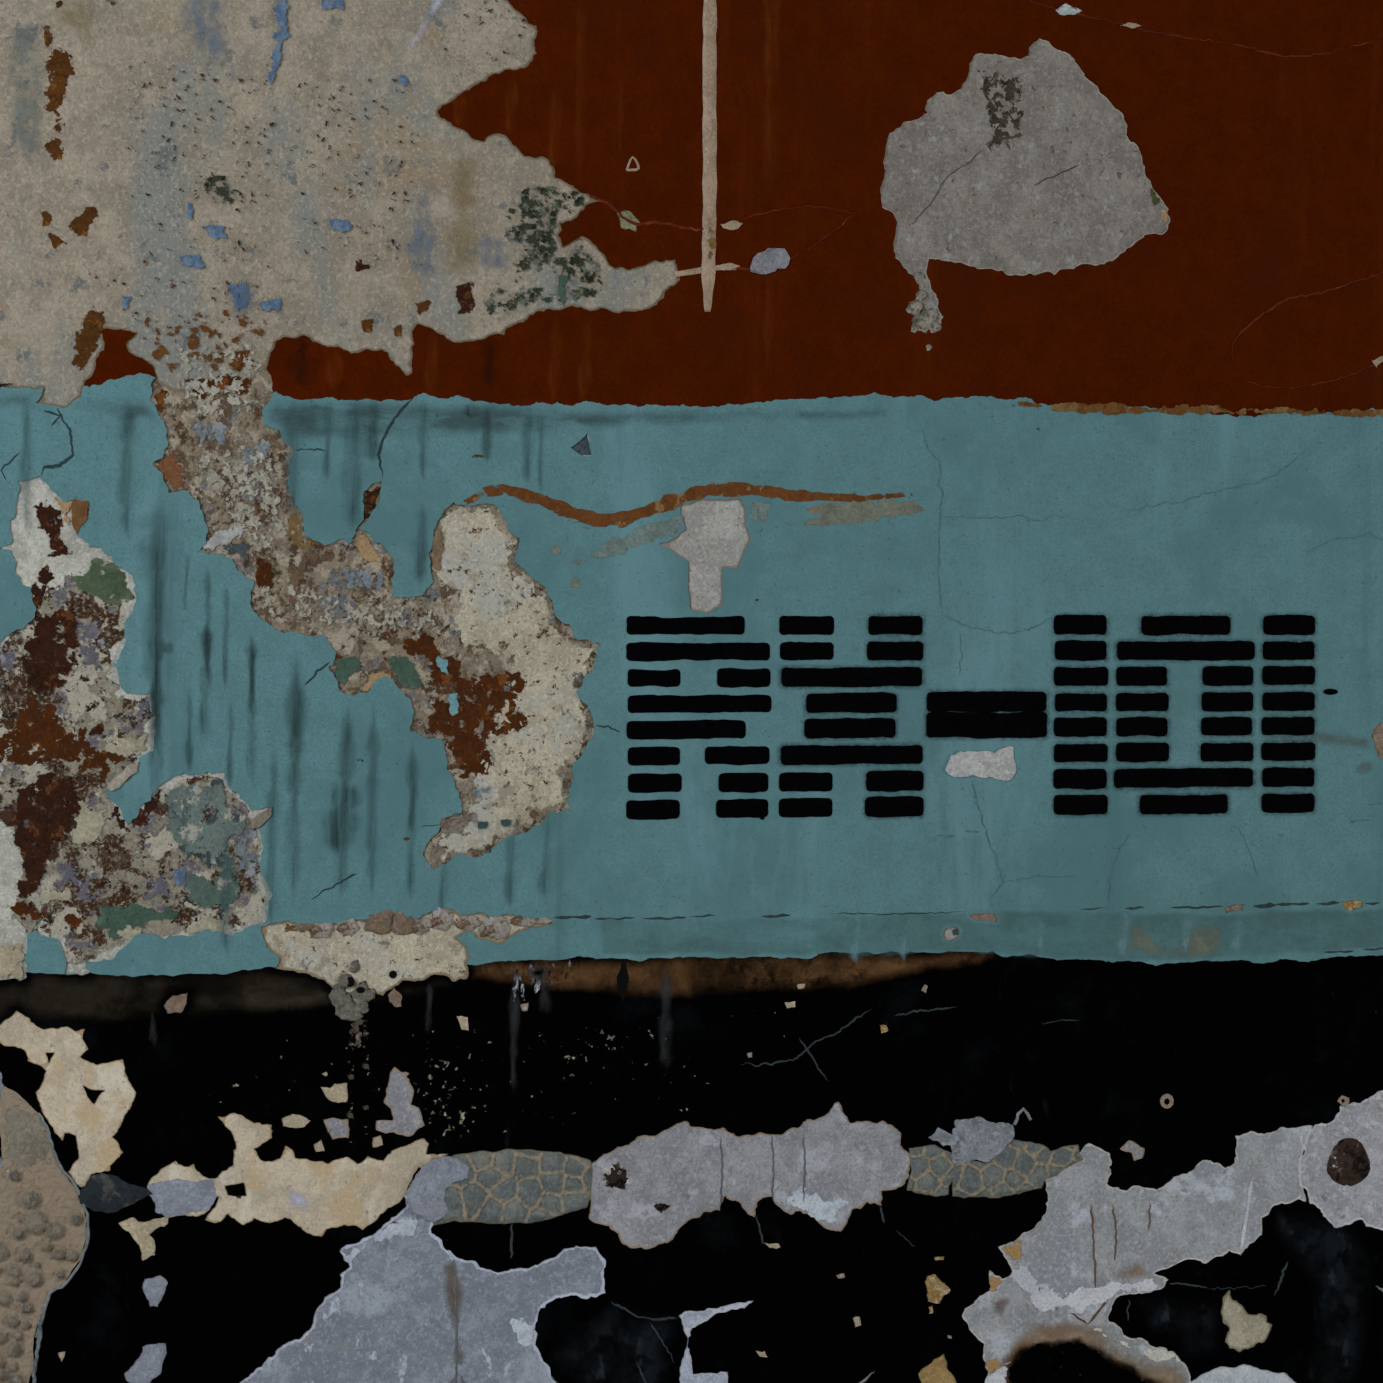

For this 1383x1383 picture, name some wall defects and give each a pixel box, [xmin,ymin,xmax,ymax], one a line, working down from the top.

flaking render [880,38,1170,351]
peeling [0,0,680,869]
rust [464,482,926,588]
leakage [152,602,160,742]
peeling [0,476,553,1007]
peeling [164,993,188,1014]
peeling [0,1011,136,1187]
flaking render [119,1067,606,1383]
flaking render [588,1101,910,1249]
peeling [918,1335,956,1383]
peeling [925,1257,951,1314]
flaking render [962,1090,1383,1383]